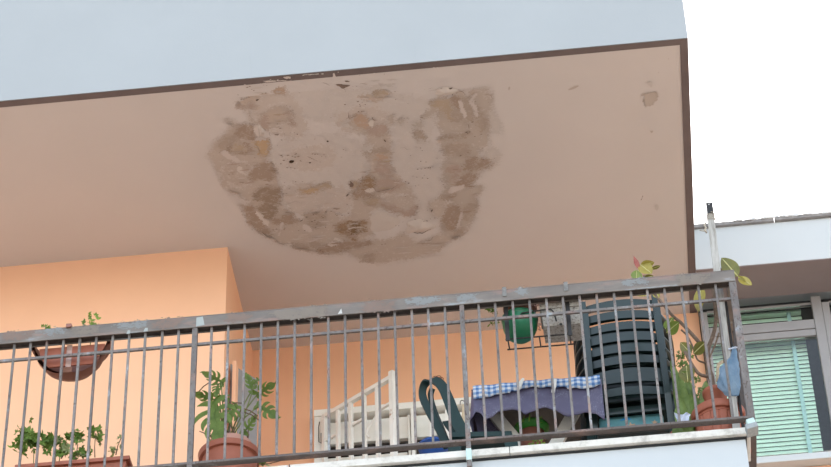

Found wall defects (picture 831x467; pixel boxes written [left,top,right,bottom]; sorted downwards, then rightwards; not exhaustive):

flaking render [208,119,369,243]